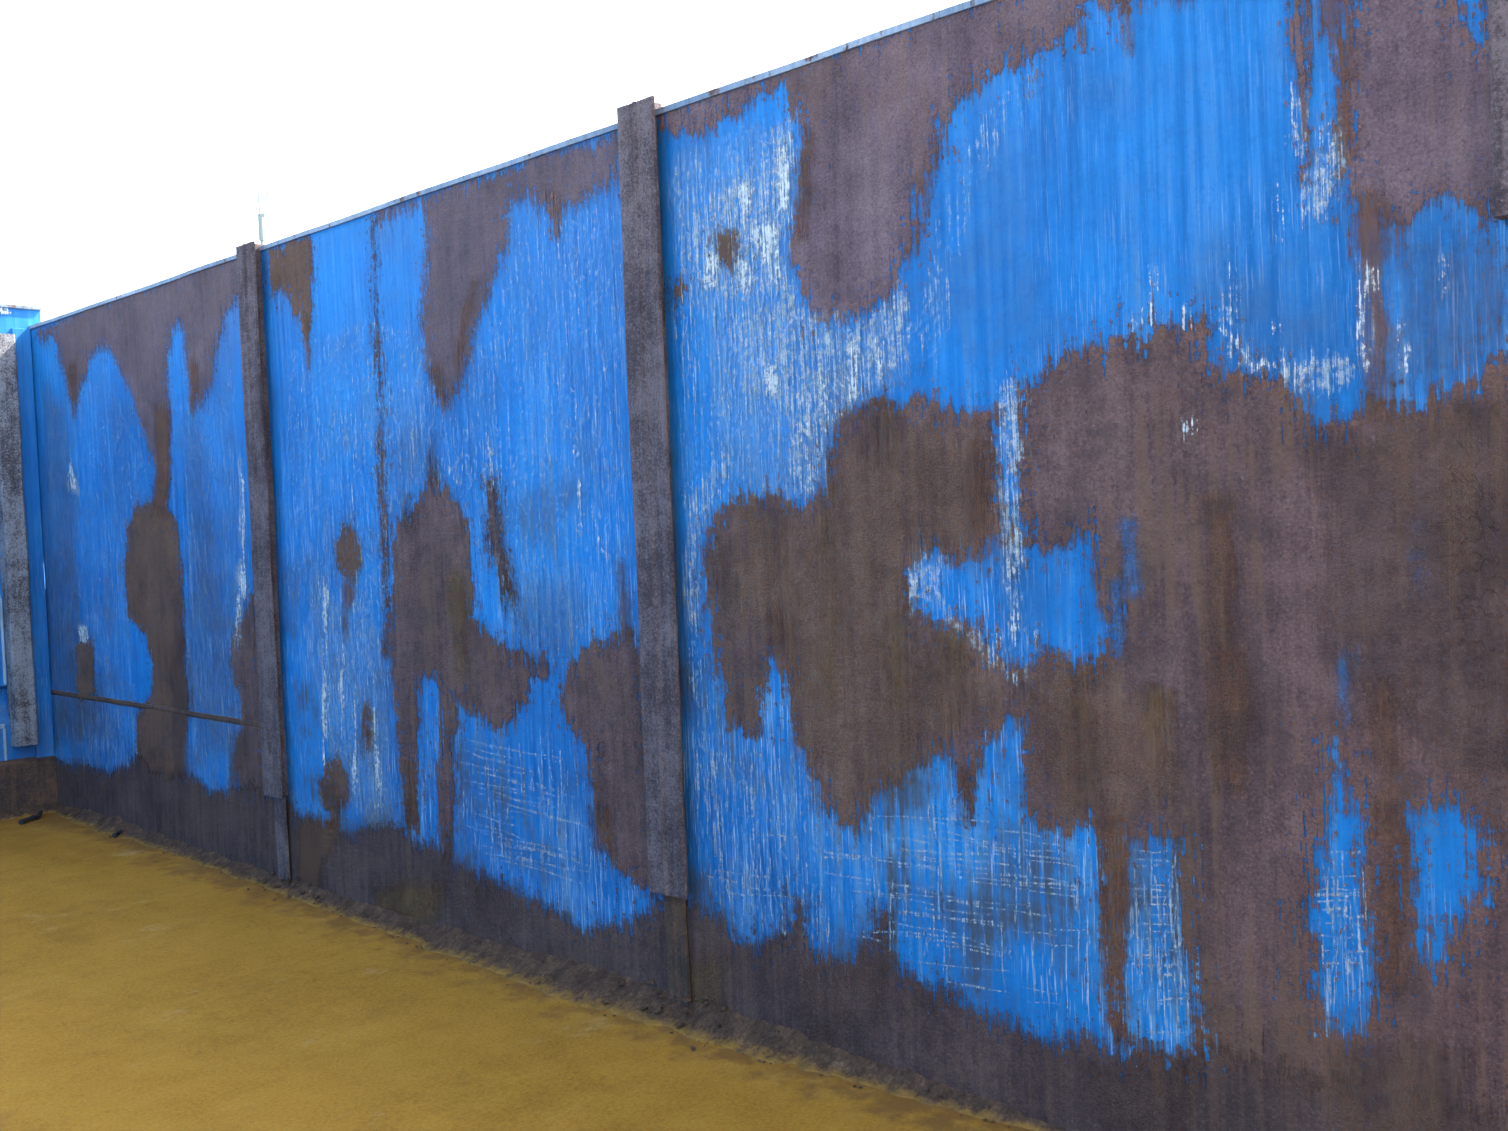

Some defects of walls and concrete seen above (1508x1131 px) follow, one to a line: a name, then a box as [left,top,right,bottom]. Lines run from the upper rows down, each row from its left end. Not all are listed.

rust [32,130,668,991]
peeling [674,126,949,494]
rust [658,0,1508,1131]